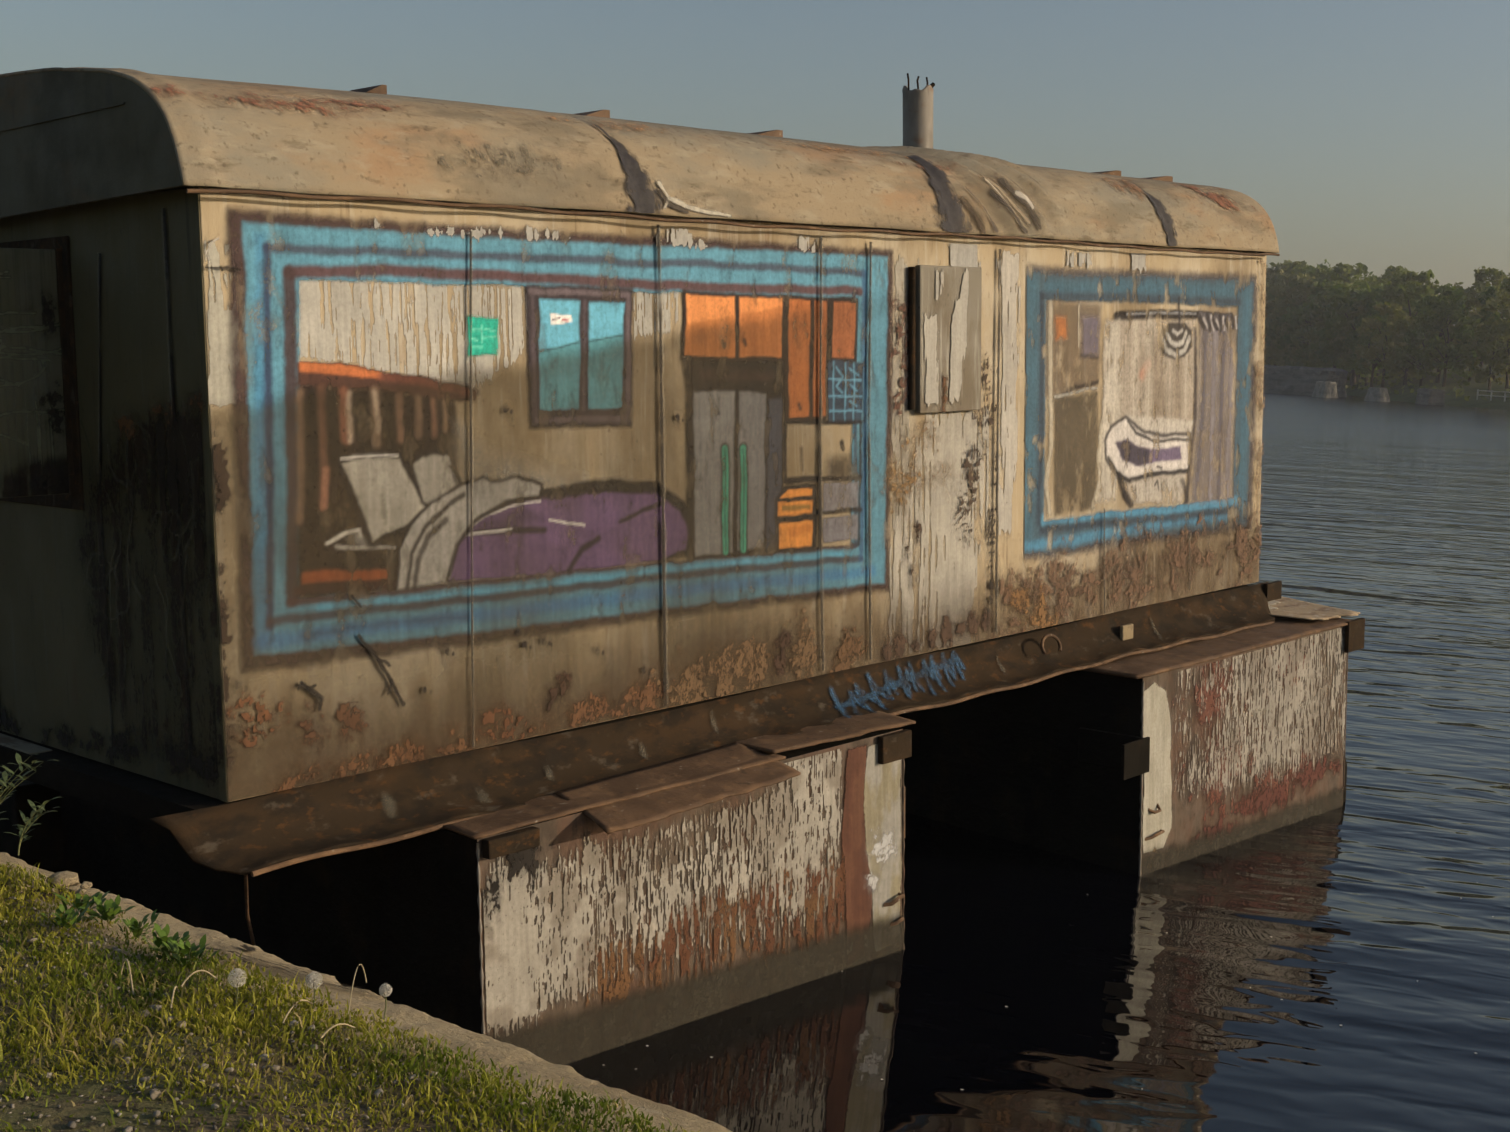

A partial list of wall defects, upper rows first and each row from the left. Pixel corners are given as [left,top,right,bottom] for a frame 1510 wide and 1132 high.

peeling [888,250,1021,656]
peeling [483,749,843,1035]
rust [582,745,872,1007]
peeling [863,743,902,925]
peeling [1143,628,1347,854]